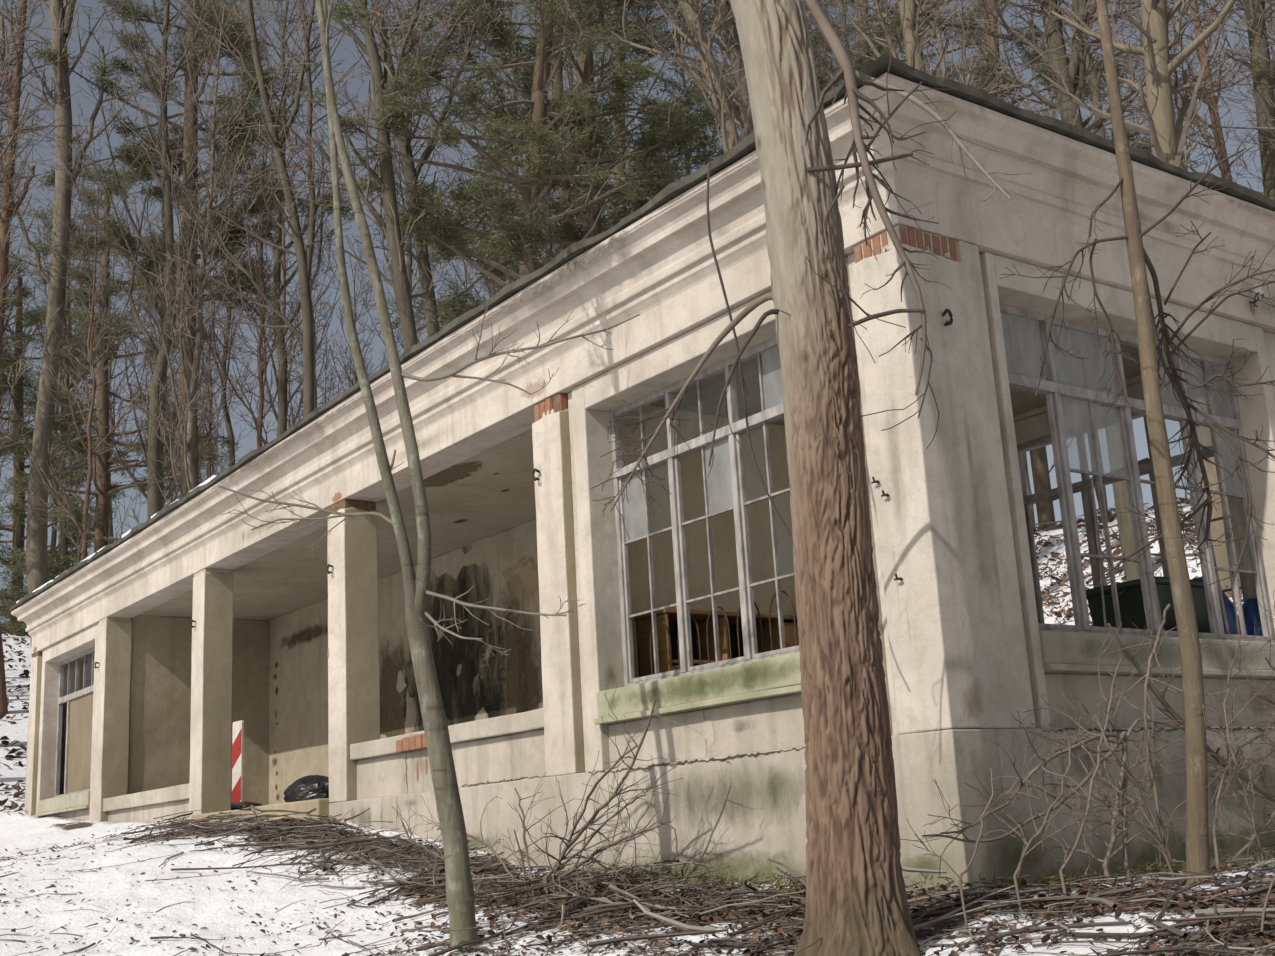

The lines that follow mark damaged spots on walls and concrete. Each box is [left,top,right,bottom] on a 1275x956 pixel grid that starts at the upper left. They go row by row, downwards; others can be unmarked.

spalling [854,225,980,265]
spalling [534,393,569,422]
spalling [423,462,482,487]
spalling [396,733,427,753]
crack [588,712,805,775]
crack [462,776,546,787]